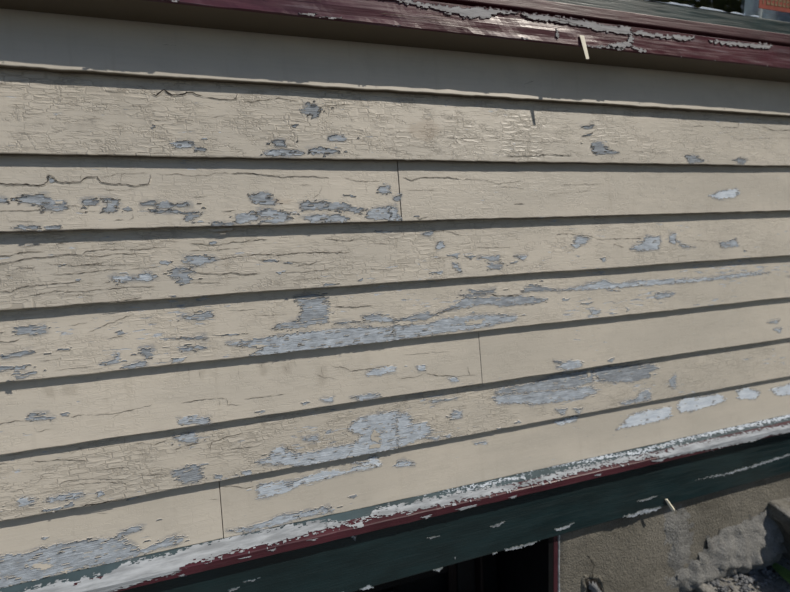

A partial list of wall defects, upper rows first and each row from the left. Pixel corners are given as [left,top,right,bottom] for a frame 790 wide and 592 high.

peeling [393,0,695,59]
peeling [709,39,772,50]
crack [151,89,296,117]
crack [447,137,571,157]
crack [0,172,380,198]
peeling [81,182,402,226]
crack [404,177,524,205]
peeling [162,271,770,363]
peeling [491,357,660,426]
peeling [616,383,790,430]
crack [37,459,170,514]
peeling [0,409,790,592]